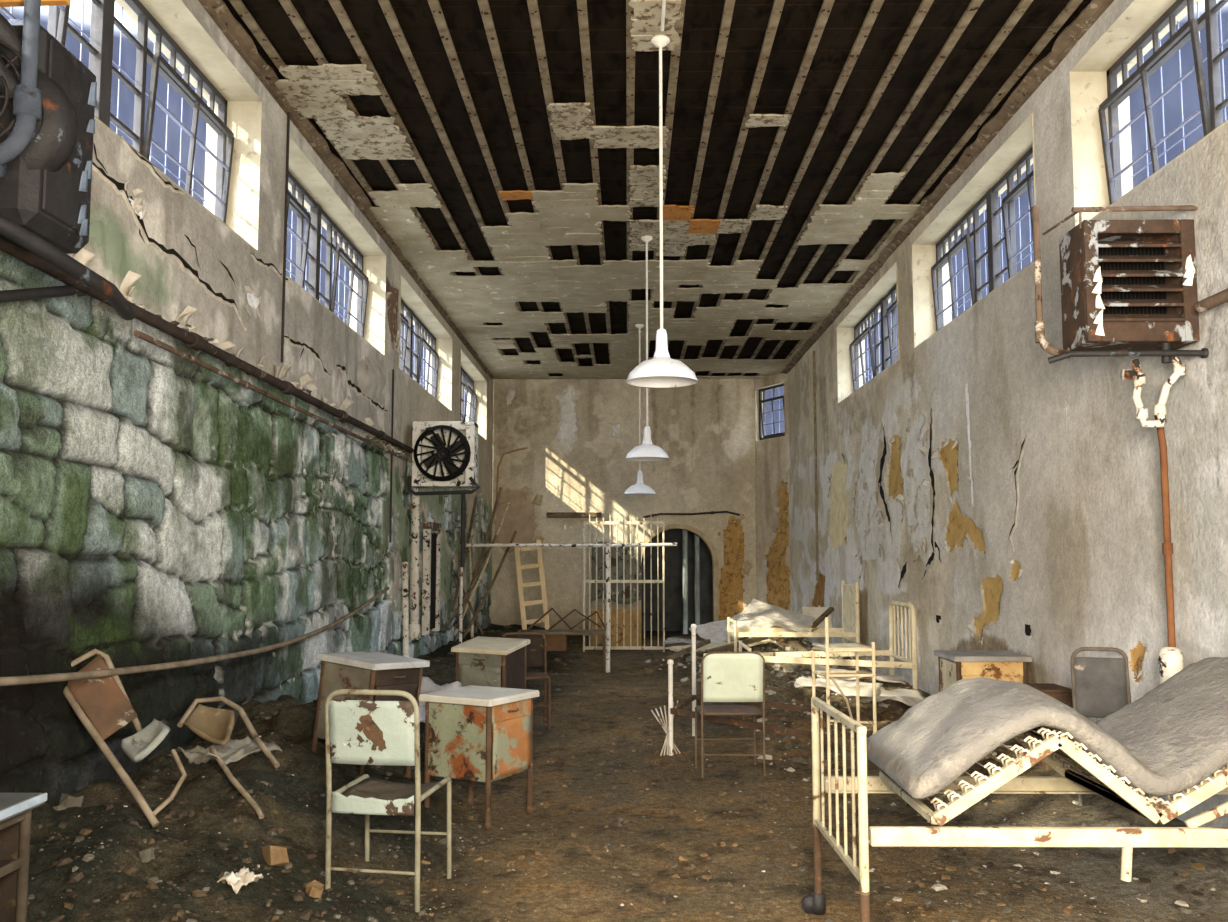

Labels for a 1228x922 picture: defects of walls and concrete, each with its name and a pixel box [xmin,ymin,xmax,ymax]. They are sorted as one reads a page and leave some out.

crack [92,136,293,331]
crack [284,336,389,413]
flaking render [717,472,791,621]
flaking render [811,566,825,607]
peeling [828,412,985,578]
flaking render [966,560,1022,645]